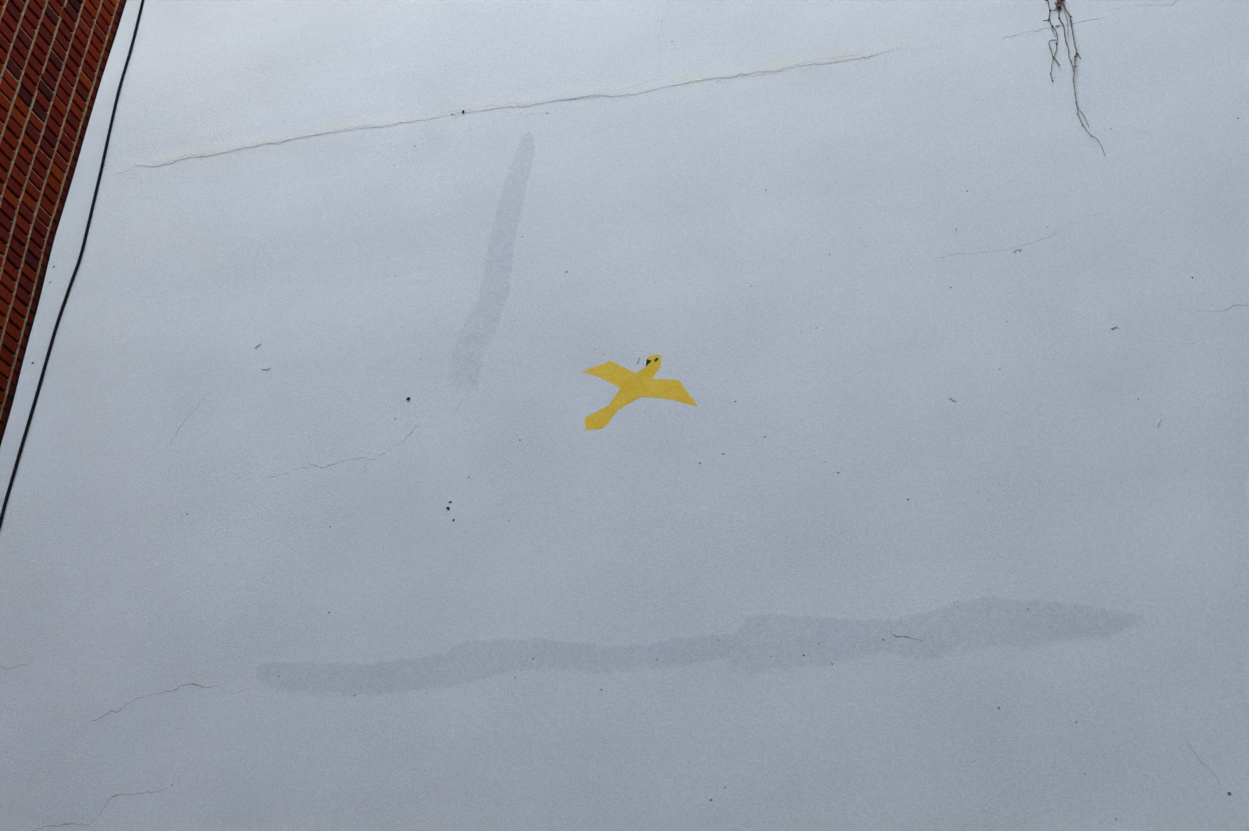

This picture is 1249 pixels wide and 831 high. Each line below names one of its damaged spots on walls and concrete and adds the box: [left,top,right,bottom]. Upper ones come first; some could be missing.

crack [113,0,890,174]
damp [448,129,538,394]
damp [254,591,1149,699]